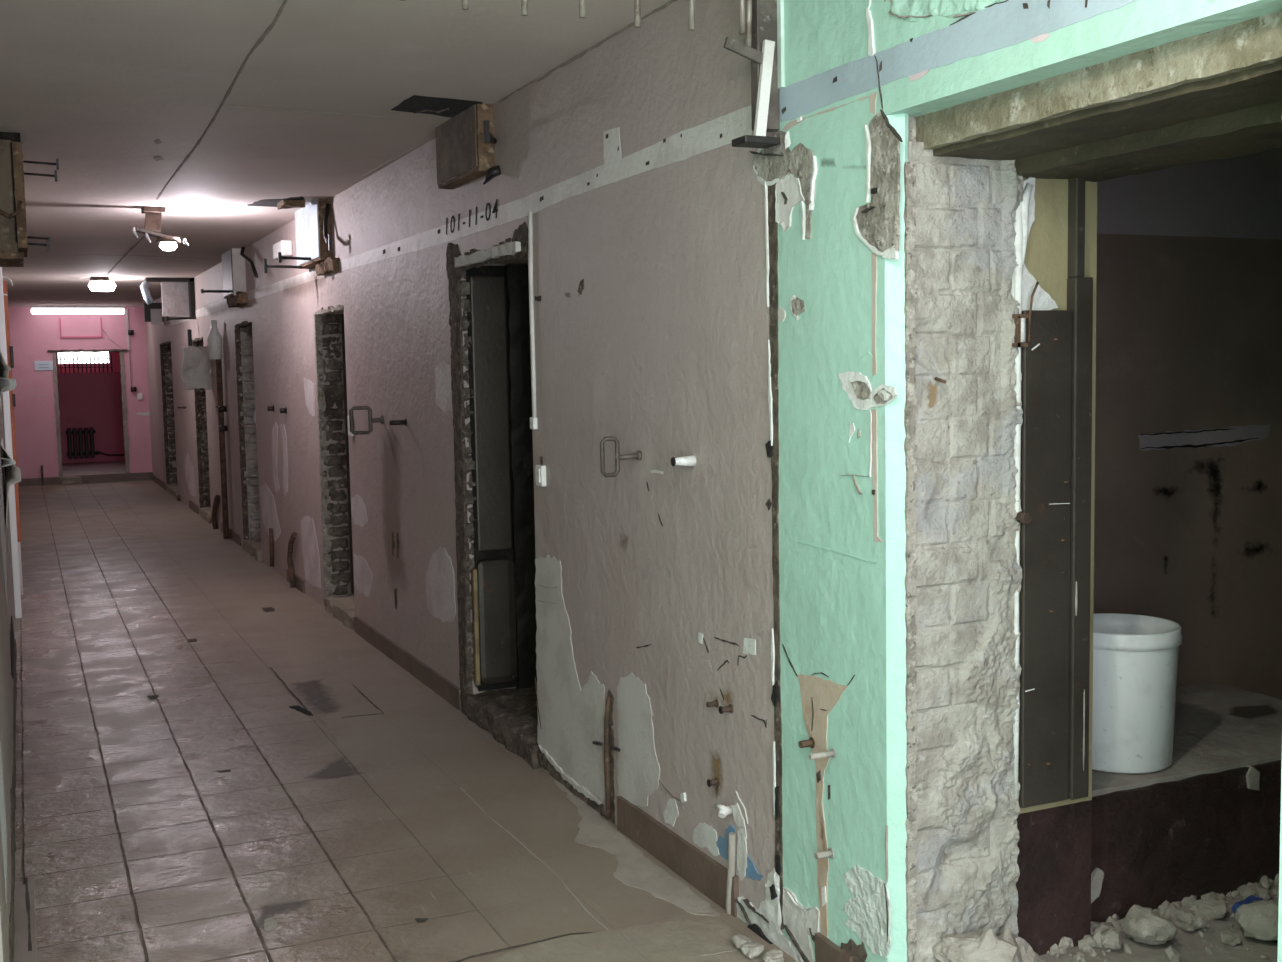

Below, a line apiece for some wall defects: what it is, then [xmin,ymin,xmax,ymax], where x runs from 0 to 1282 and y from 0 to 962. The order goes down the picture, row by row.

peeling [535,555,687,826]
flaking render [693,92,1058,962]